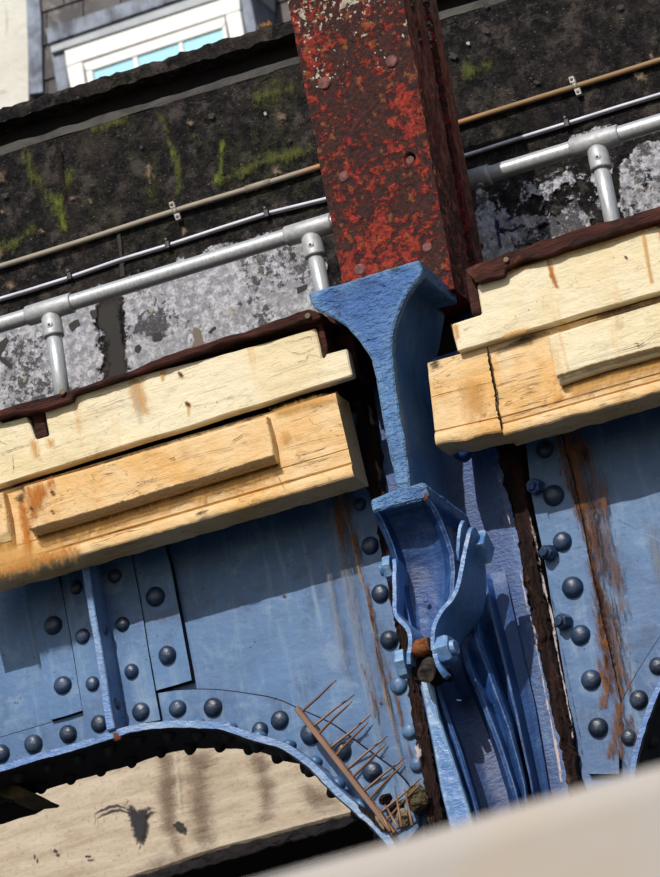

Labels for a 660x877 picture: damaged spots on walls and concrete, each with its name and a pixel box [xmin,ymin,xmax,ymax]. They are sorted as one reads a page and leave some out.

peeling [0,323,54,410]
peeling [61,303,105,391]
peeling [203,240,236,254]
peeling [121,243,319,372]
crack [433,346,542,435]
peeling [475,166,601,261]
rust [465,206,660,317]
peeling [610,140,660,218]
rust [556,429,638,758]
rust [333,491,449,832]
damp [157,751,213,852]
damp [250,754,272,817]